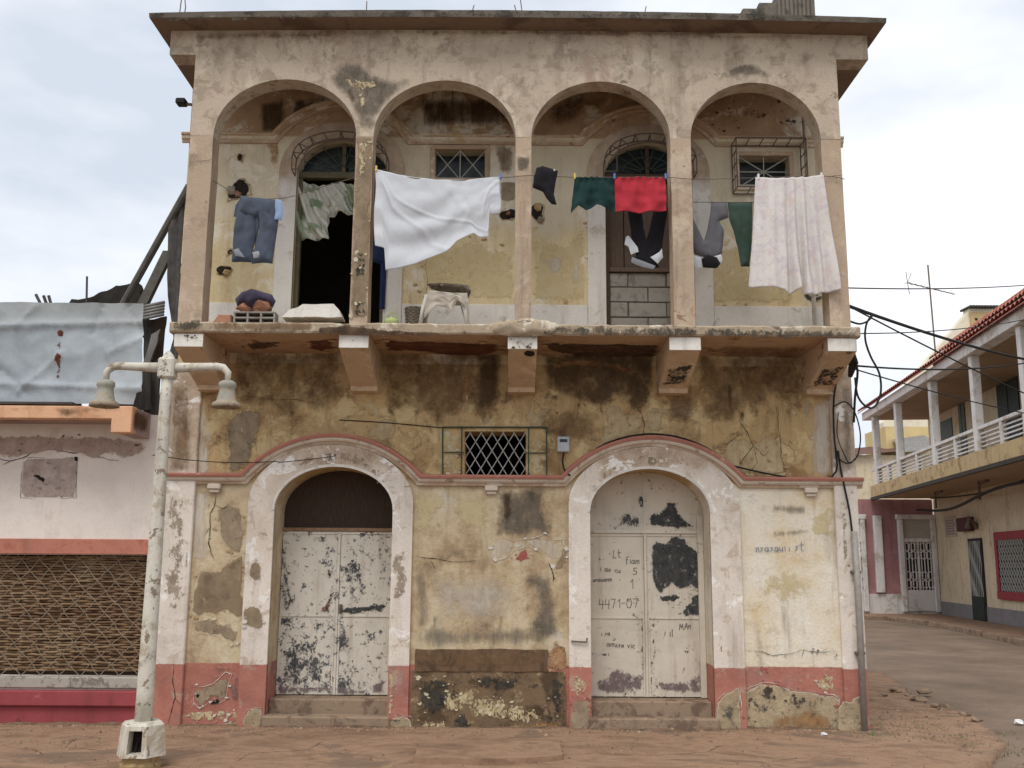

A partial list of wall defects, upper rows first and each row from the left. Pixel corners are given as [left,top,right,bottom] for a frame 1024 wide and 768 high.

water stain [336,66,396,124]
flaking render [315,137,443,354]
water stain [382,354,498,417]
water stain [547,355,652,408]
flaking render [0,434,143,499]
crack [726,409,796,474]
water stain [498,490,547,533]
flaking render [165,495,266,647]
flaking render [278,540,538,727]
flaking render [548,641,567,672]
flaking render [186,672,262,726]
flaking render [717,666,871,730]